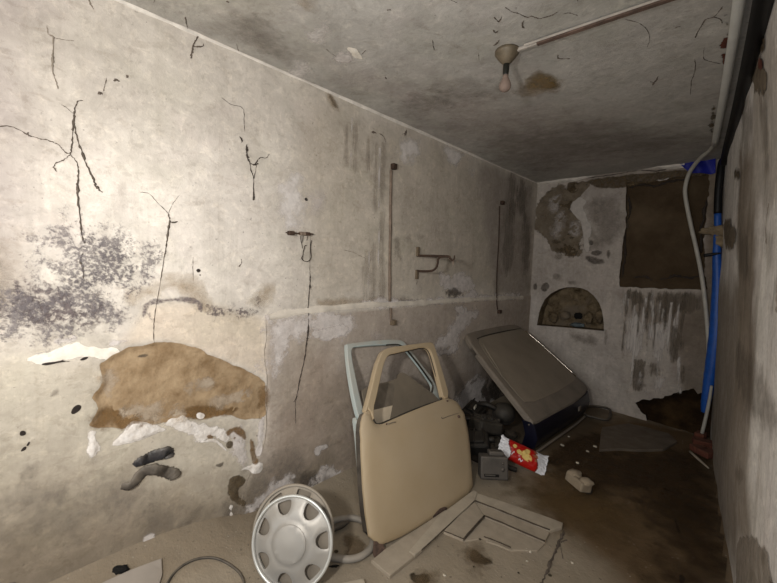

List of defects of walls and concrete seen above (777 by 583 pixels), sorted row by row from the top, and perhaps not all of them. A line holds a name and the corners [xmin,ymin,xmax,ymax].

crack [47,28,73,89]
crack [0,125,70,172]
flaking render [535,181,592,257]
water stain [0,225,163,345]
crack [294,276,311,423]
water stain [621,288,698,393]
flaking render [89,342,268,464]
crack [540,530,567,583]